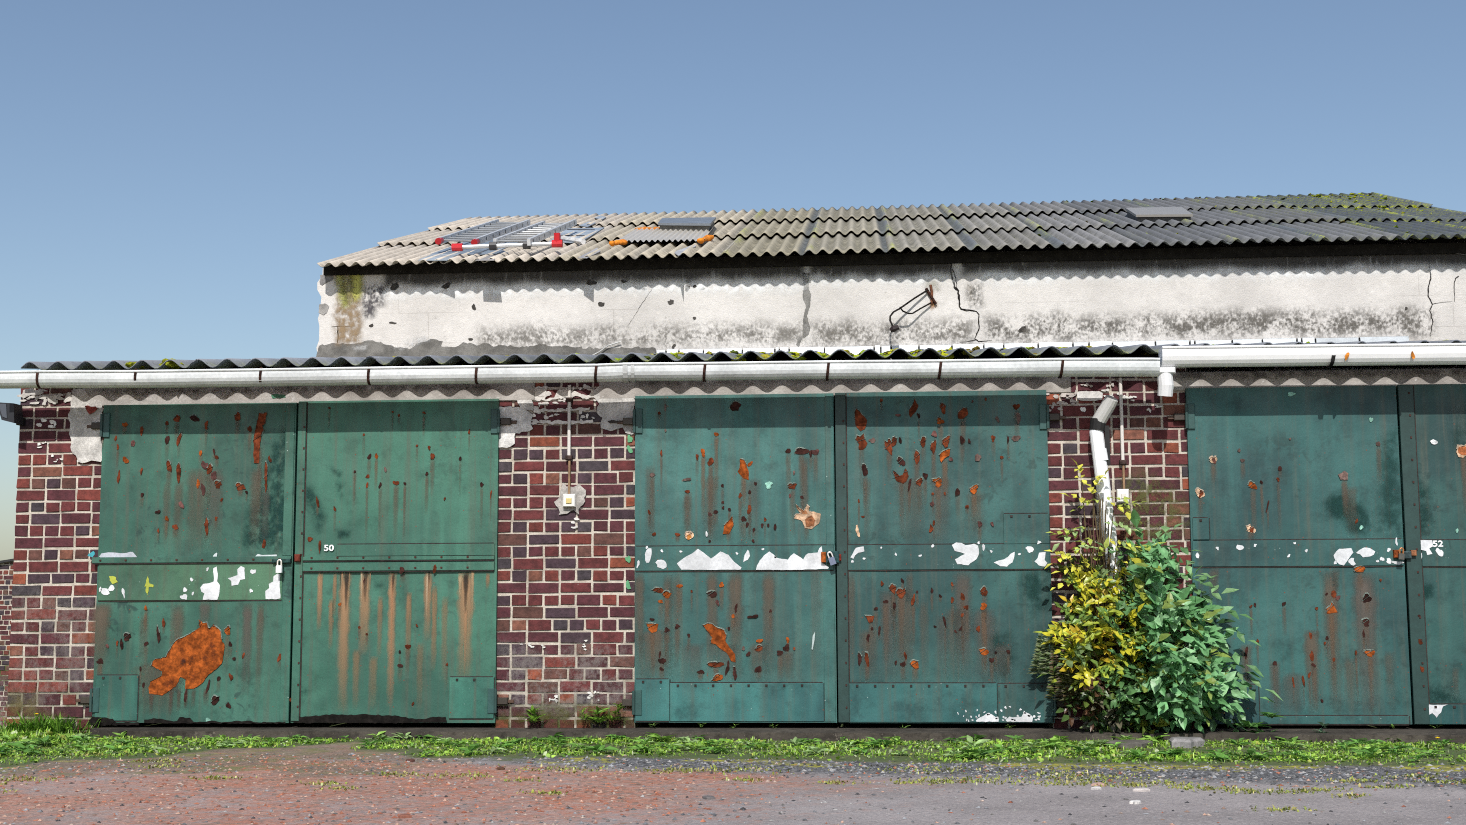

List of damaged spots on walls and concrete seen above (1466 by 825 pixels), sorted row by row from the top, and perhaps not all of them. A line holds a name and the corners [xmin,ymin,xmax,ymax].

leakage [335,274,945,349]
crack [796,273,811,346]
leakage [818,323,970,343]
leakage [988,311,1428,339]
crack [1427,264,1459,336]
peeling [17,388,104,463]
rust [854,398,1021,532]
peeling [180,553,281,600]
peeling [636,531,829,570]
peeling [952,541,1047,567]
rust [87,605,447,726]
rust [646,582,795,681]